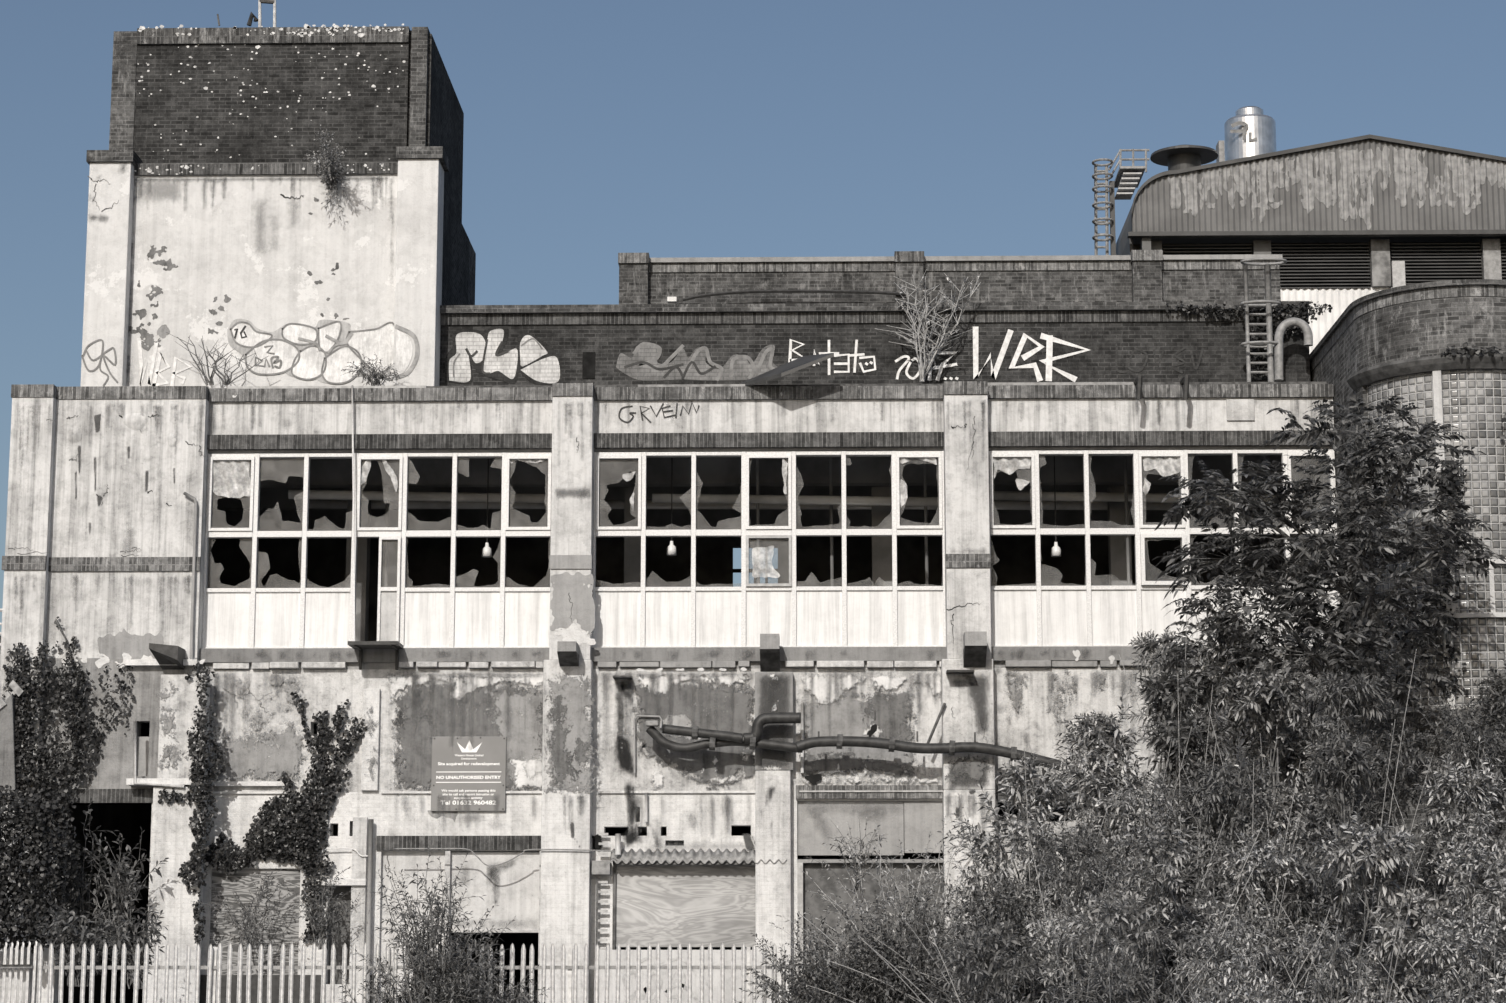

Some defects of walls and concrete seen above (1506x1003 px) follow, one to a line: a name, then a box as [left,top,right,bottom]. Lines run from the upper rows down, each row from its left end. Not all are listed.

peeling [1168,146,1506,230]
peeling [555,623,596,646]
peeling [636,667,750,716]
peeling [800,672,941,705]
peeling [571,738,591,773]
peeling [702,752,781,785]
peeling [801,761,942,785]